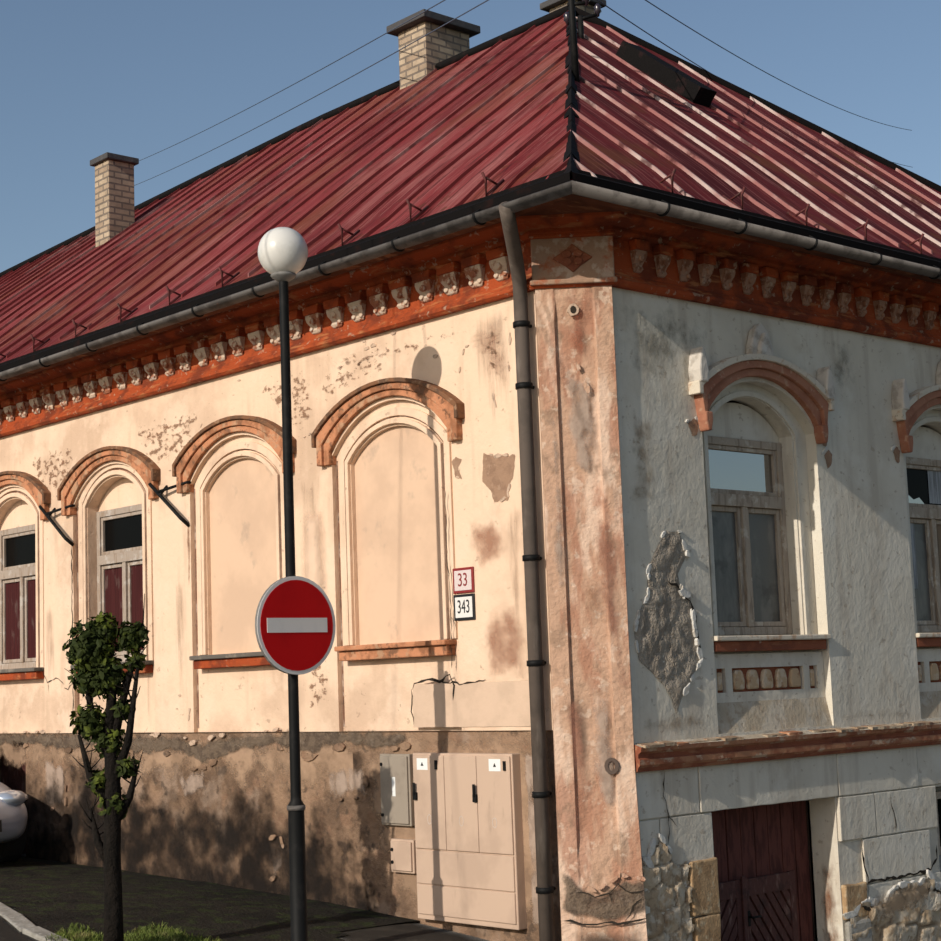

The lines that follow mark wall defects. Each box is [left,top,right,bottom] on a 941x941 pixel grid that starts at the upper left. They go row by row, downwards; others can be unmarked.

peeling [138,417,202,458]
peeling [482,453,515,502]
water stain [477,528,497,557]
crack [411,492,486,722]
water stain [490,618,516,663]
spalling [633,531,703,714]
water stain [21,765,104,867]
water stain [121,803,290,896]
water stain [305,837,373,912]
crack [565,872,647,925]
spalling [563,833,694,941]
spalling [842,869,941,941]